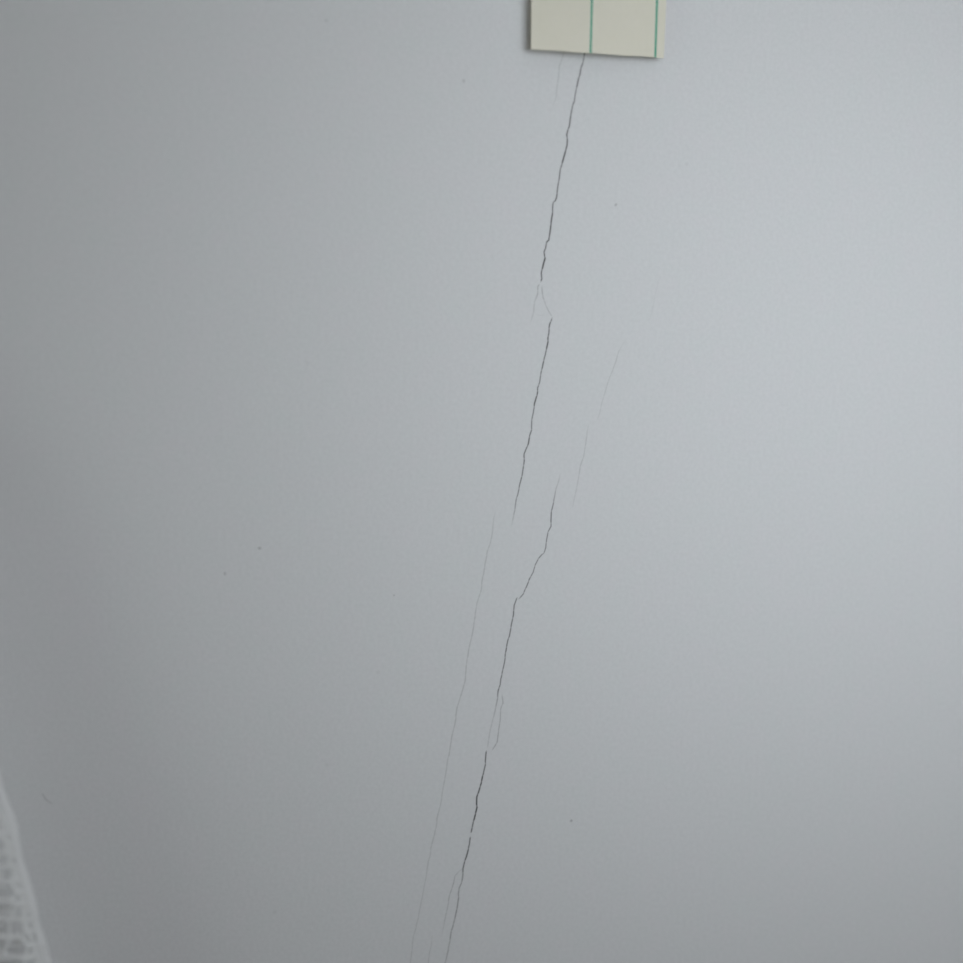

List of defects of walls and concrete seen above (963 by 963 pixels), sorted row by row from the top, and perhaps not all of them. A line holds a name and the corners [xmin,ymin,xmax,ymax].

crack [409,51,589,963]